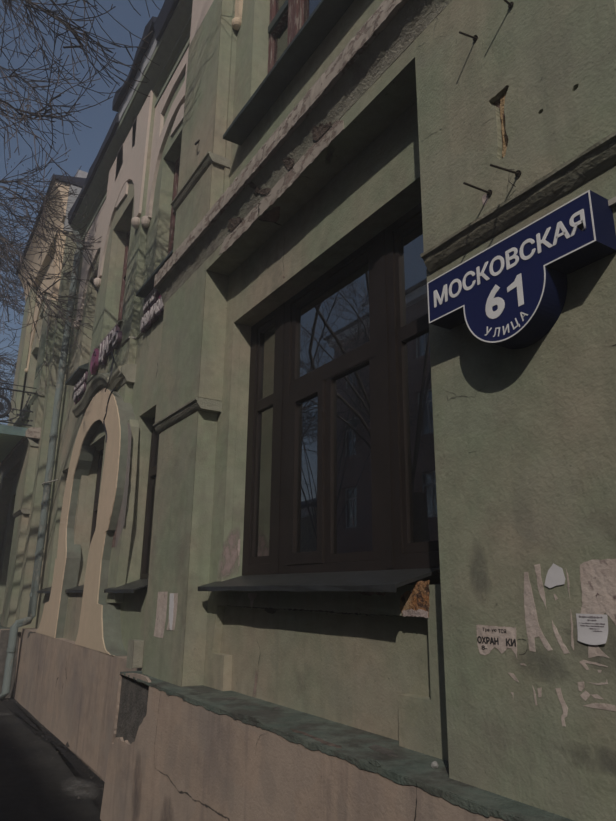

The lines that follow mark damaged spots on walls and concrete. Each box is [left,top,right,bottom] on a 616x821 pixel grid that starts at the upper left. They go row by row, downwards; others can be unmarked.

spalling [115,674,152,744]
crack [154,693,230,821]